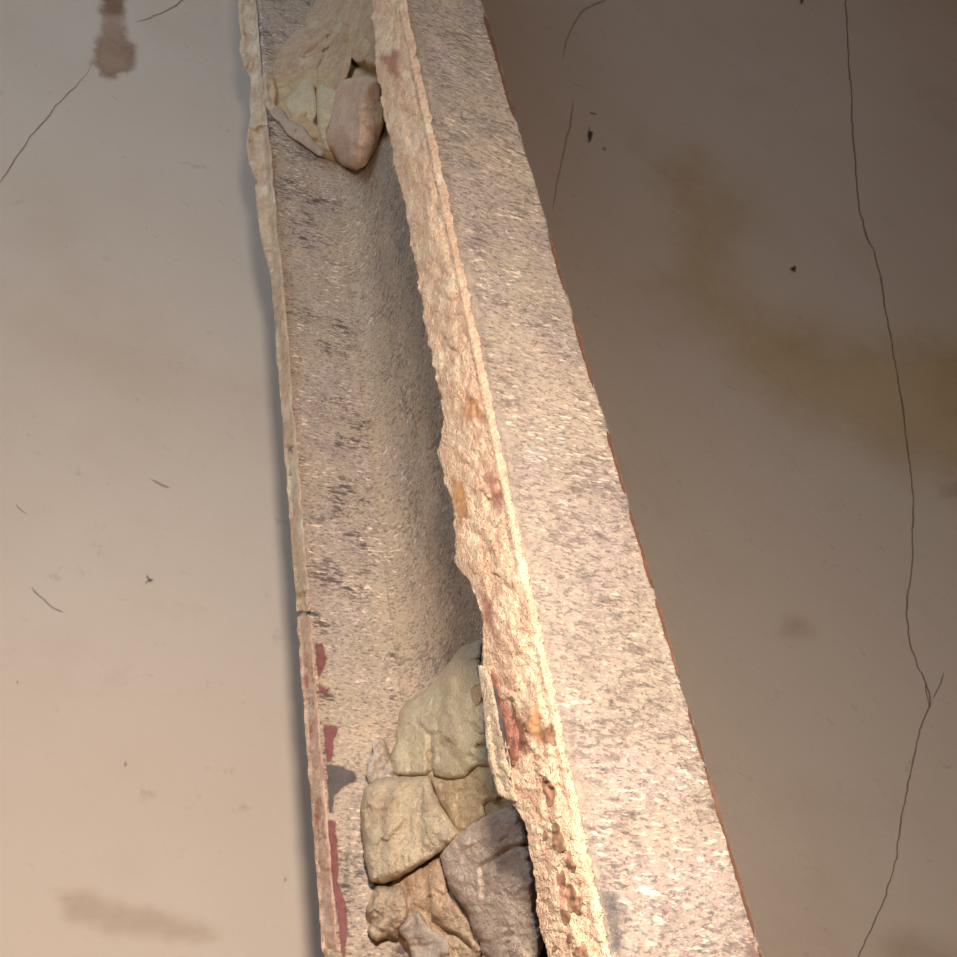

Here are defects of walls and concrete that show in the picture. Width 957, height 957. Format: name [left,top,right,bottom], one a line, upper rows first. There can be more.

spalling [270,79,336,158]
spalling [494,686,511,780]
spalling [539,723,556,745]
peeling [297,615,348,957]
spalling [542,776,557,806]
spalling [542,823,589,957]
peeling [399,911,450,957]